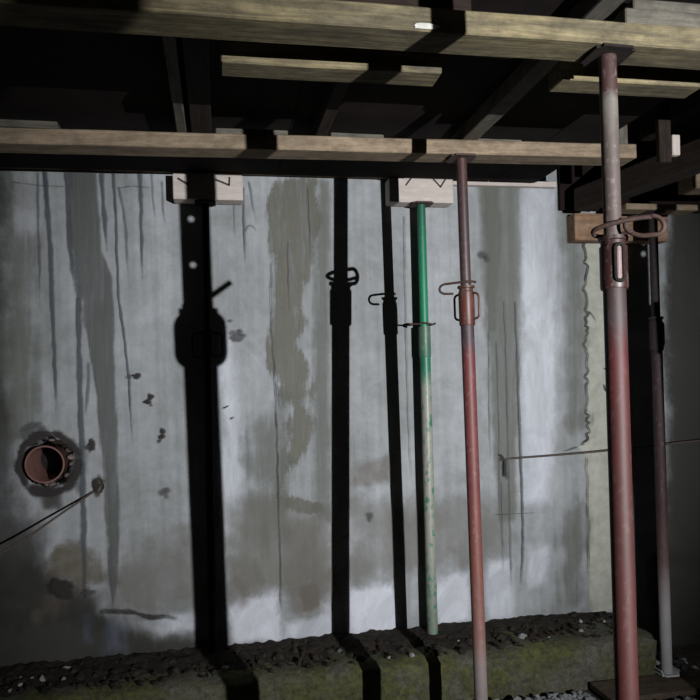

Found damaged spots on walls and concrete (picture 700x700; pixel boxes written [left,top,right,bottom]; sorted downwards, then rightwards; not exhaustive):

damp [0,169,11,228]
damp [65,170,132,599]
spalling [231,329,246,342]
damp [217,177,329,553]
damp [481,187,559,586]
crack [568,243,606,564]
spalling [15,431,96,497]
damp [0,251,207,666]
efflorescence [230,593,335,644]
damp [344,557,400,634]
efflorescence [437,573,470,624]
damp [486,557,514,619]